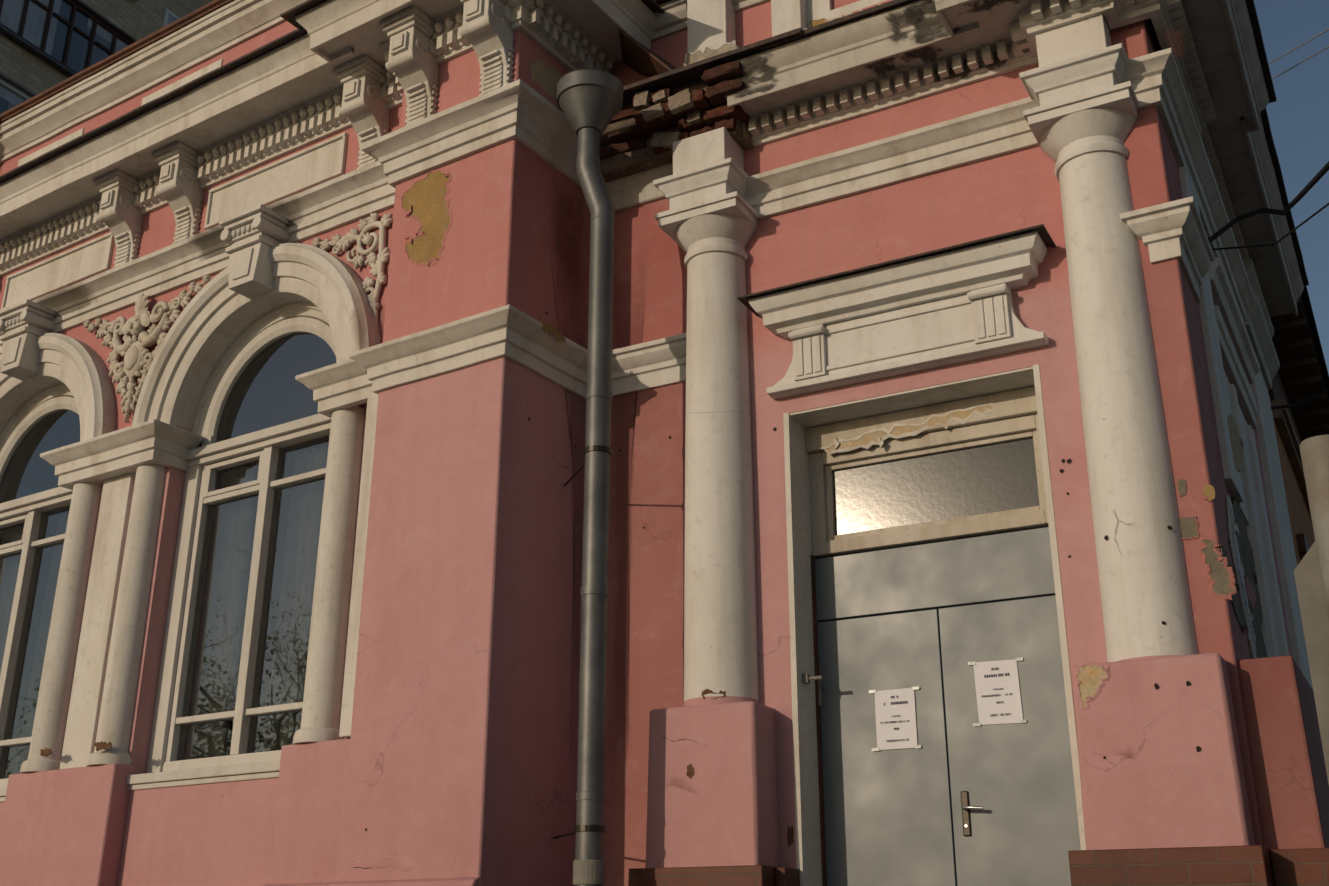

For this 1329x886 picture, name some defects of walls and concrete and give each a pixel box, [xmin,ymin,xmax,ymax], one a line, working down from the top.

damp [865,0,1007,82]
damp [965,0,1020,23]
peeling [529,57,562,100]
flaking render [599,40,750,160]
peeling [400,167,453,267]
peeling [818,402,996,455]
peeling [1227,414,1244,473]
peeling [1177,479,1267,659]
peeling [1073,661,1111,711]